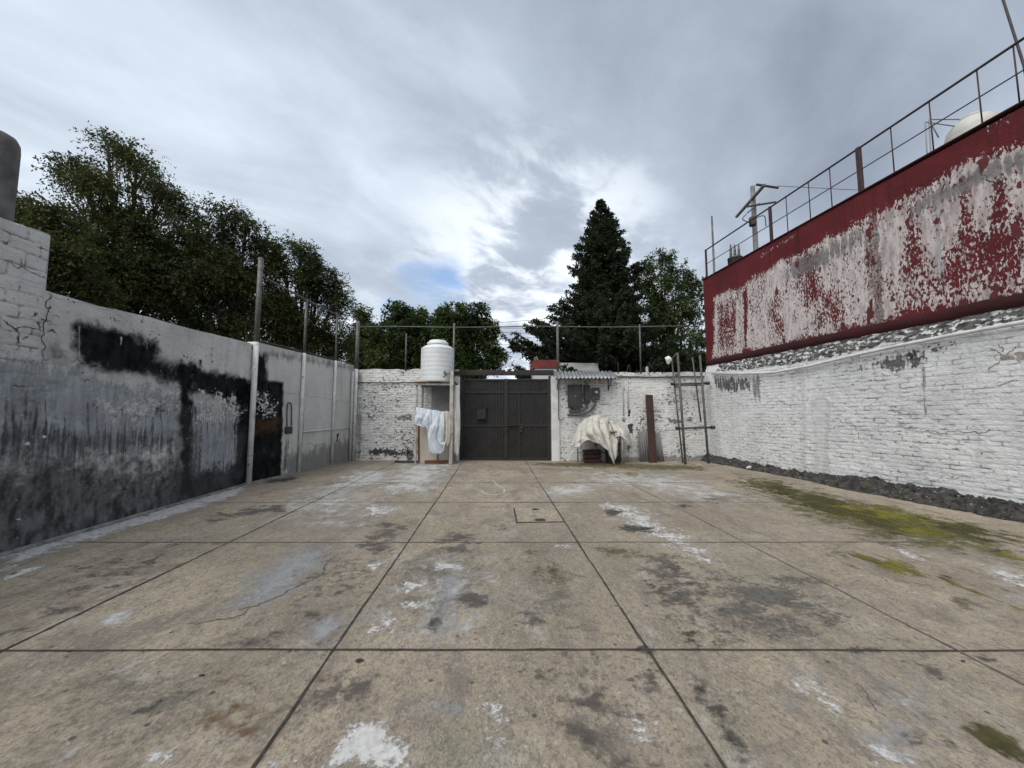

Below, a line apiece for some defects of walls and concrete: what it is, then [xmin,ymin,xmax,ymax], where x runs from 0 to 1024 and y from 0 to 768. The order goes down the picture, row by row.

peeling [712,140,1024,358]
crack [3,241,129,443]
leakage [0,341,181,471]
leakage [191,403,239,472]
peeling [368,383,413,461]
peeling [988,344,1024,370]
leakage [0,416,459,645]
crack [184,556,335,624]